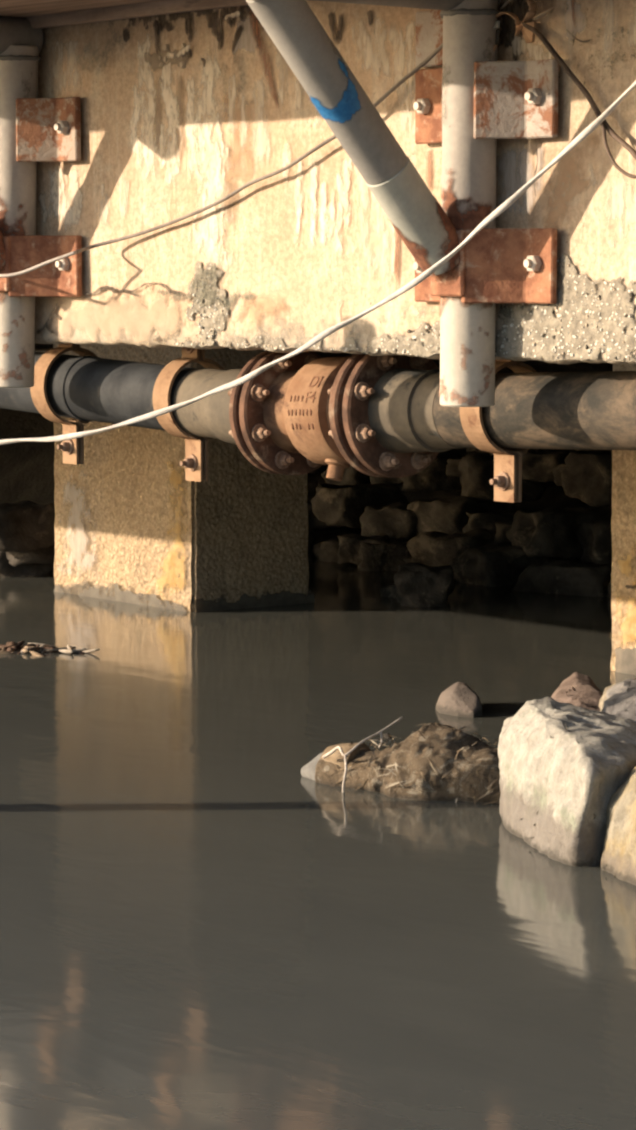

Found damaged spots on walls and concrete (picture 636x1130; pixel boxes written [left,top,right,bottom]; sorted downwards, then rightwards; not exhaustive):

damp [130,35,396,283]
corrosion [0,200,27,271]
corrosion [392,151,492,281]
crack [37,303,62,333]
crack [84,283,180,296]
spalling [154,261,440,357]
spalling [495,254,636,362]